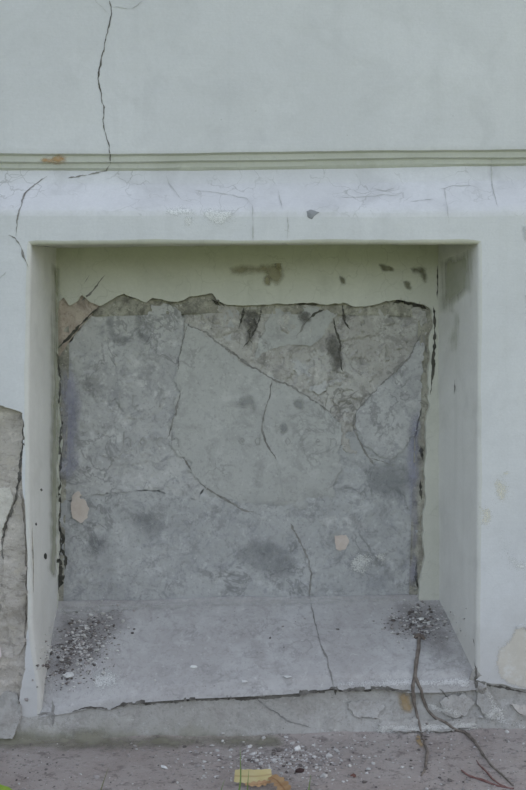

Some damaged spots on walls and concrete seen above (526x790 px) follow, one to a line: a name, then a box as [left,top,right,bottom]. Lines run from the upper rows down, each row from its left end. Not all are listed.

crack [69,0,142,178]
crack [9,176,47,266]
crack [169,395,254,512]
spalling [58,296,427,601]
crack [177,324,328,489]
damp [235,263,282,284]
crack [296,305,350,371]
crack [352,331,427,466]
spalling [0,405,37,739]
crack [37,523,411,728]
spalling [347,685,499,733]
peeling [496,624,526,689]